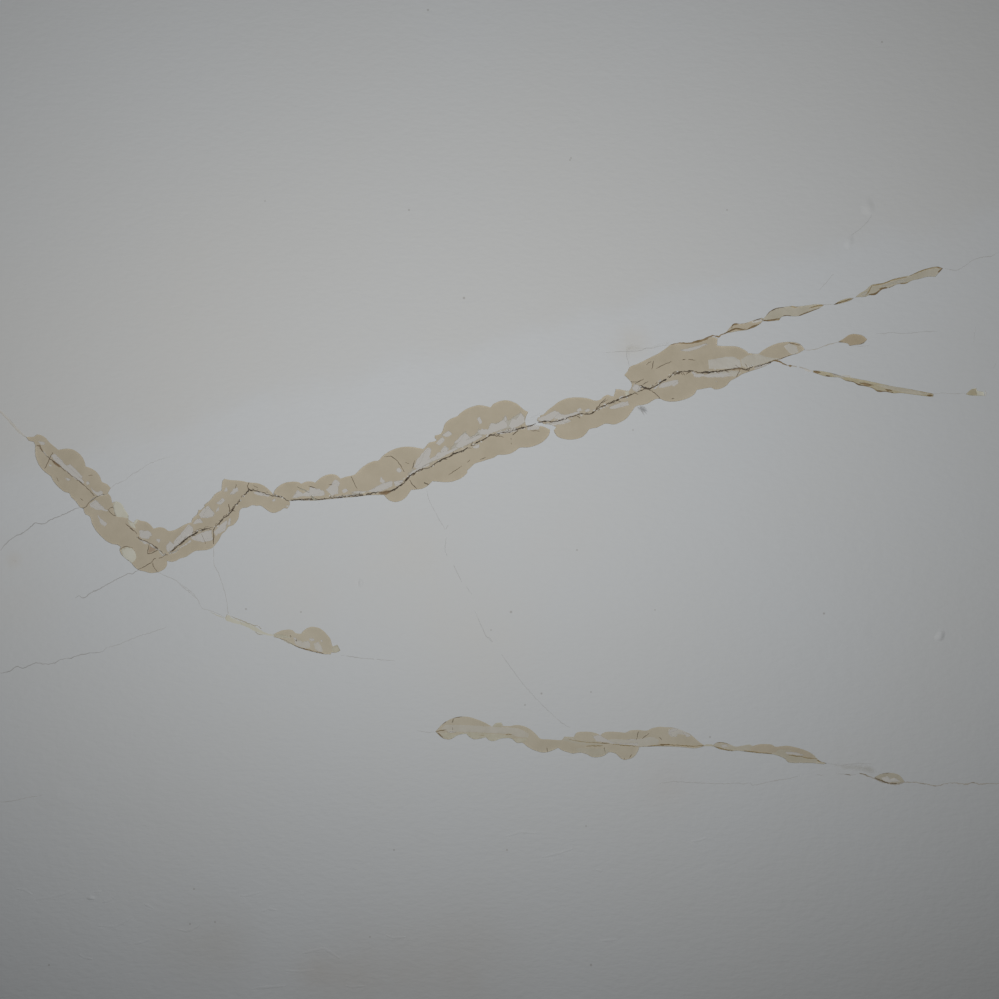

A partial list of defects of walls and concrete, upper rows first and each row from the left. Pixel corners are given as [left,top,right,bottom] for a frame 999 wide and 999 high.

peeling [27,267,942,573]
crack [1,445,170,550]
crack [77,331,937,728]
peeling [211,612,340,654]
peeling [436,716,825,764]
crack [660,763,999,786]